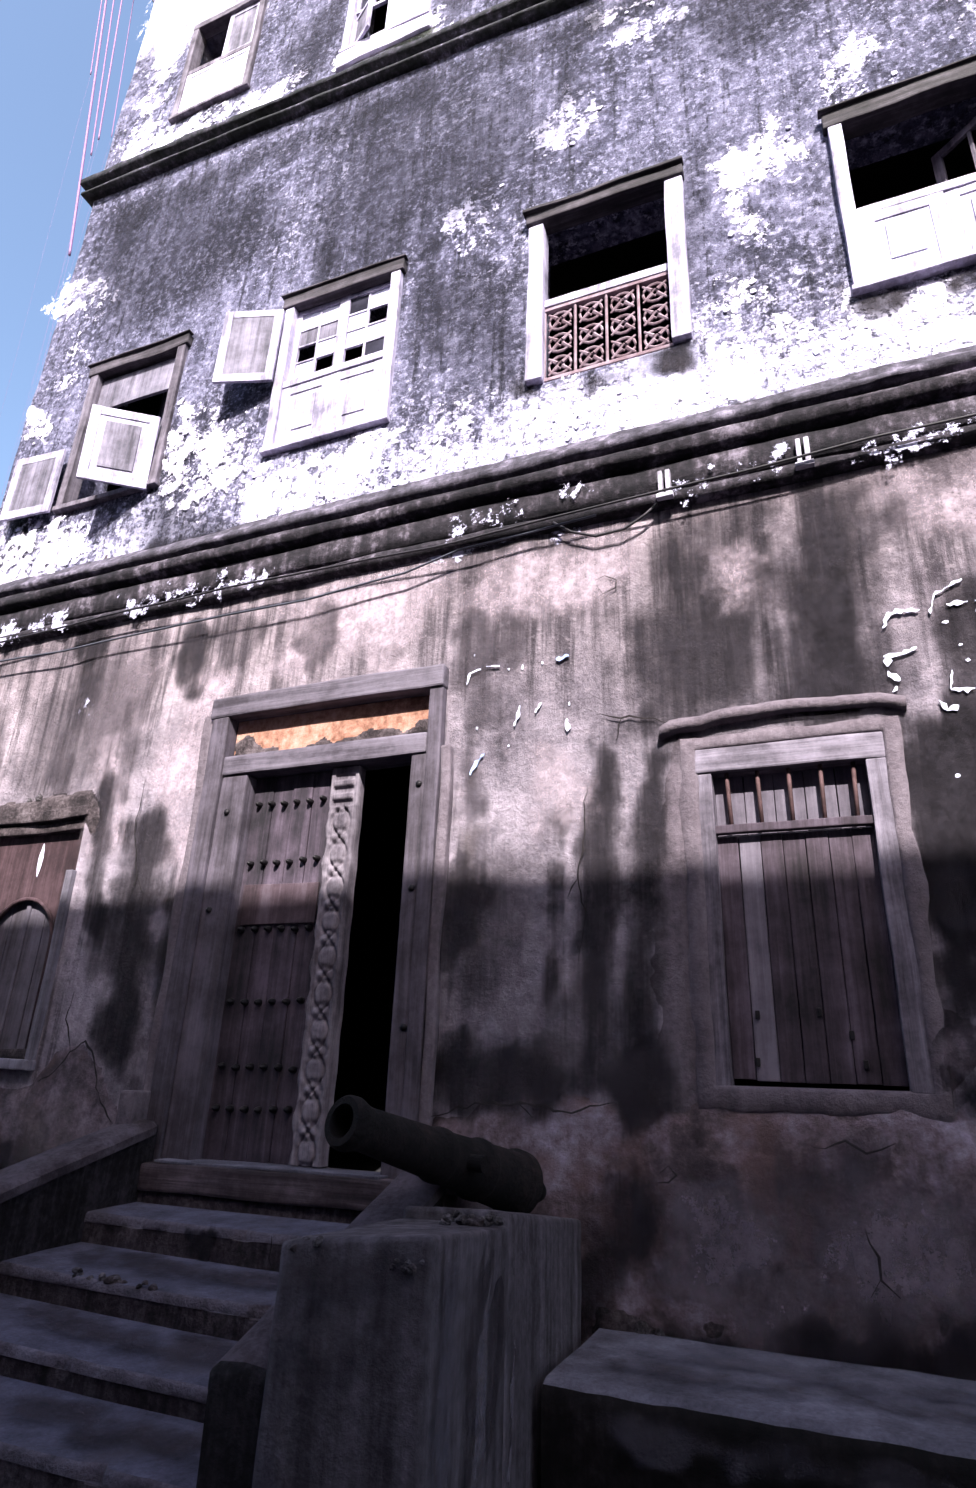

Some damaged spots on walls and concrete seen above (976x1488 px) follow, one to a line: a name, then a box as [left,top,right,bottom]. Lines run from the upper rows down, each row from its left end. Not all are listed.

peeling [519,270,976,455]
peeling [159,388,499,523]
peeling [852,410,976,468]
peeling [0,513,108,585]
peeling [117,567,275,620]
leakage [173,614,260,698]
leakage [18,626,175,1082]
leakage [433,485,896,1132]
leakage [902,576,976,1034]
crack [39,994,111,1122]
leakage [581,1173,663,1338]
crack [864,1229,901,1299]